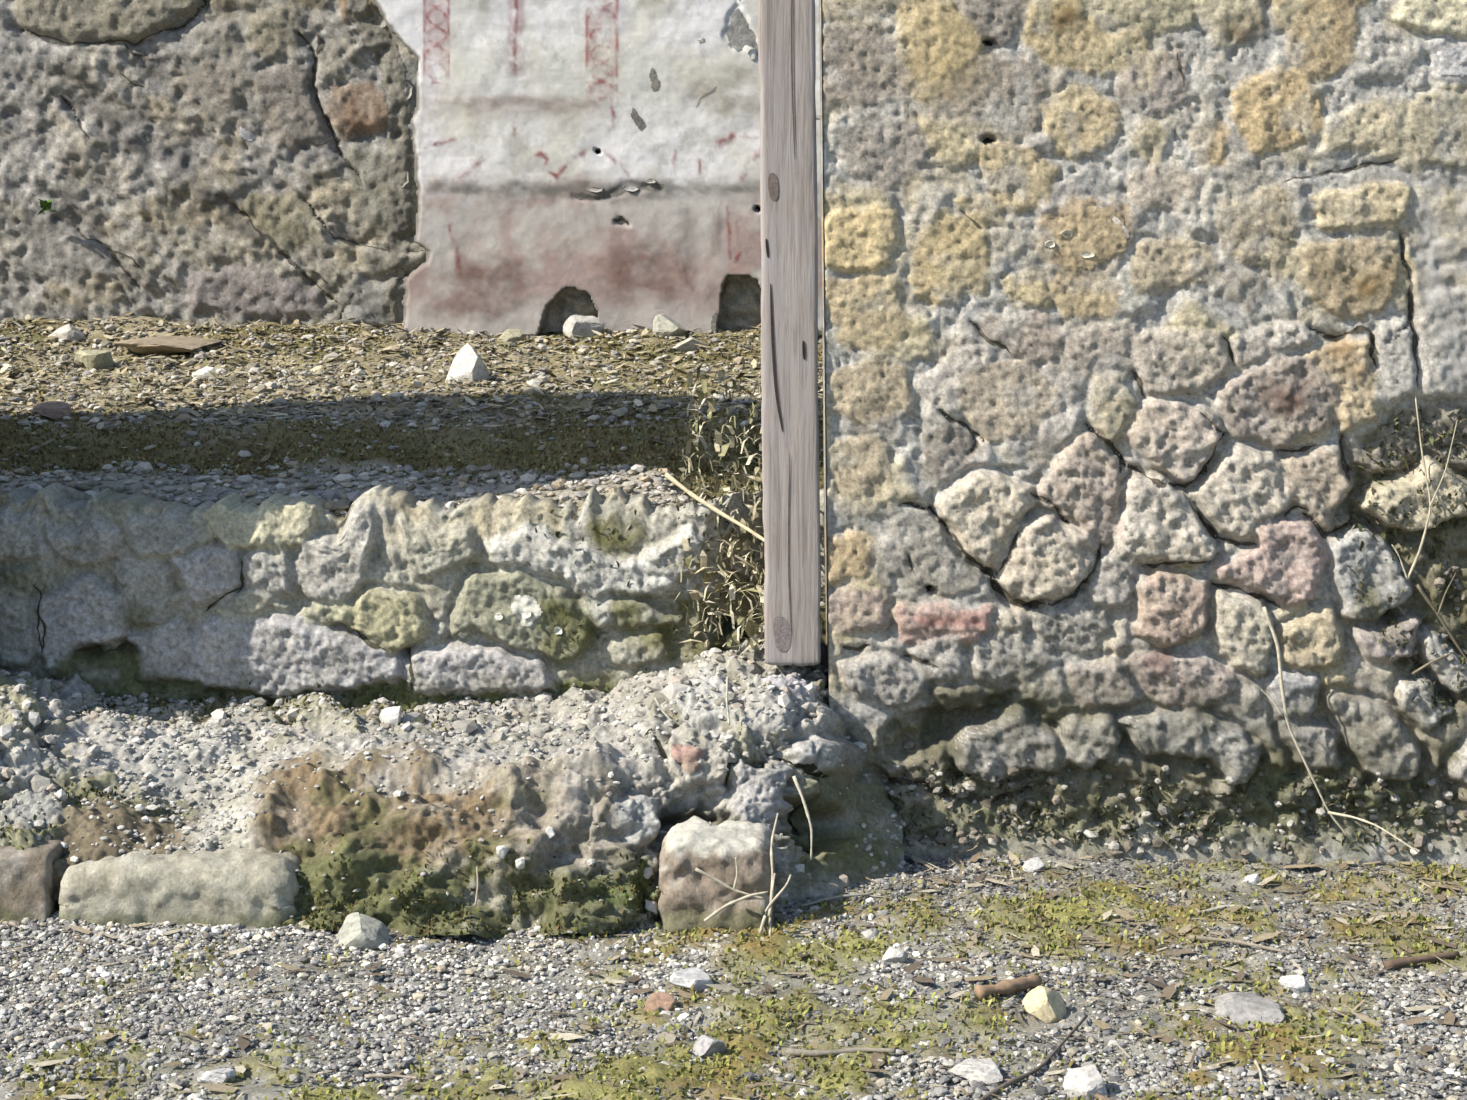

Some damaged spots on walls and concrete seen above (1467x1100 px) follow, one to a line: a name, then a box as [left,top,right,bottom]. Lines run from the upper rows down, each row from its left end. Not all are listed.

spalling [345,0,413,321]
crack [1309,235,1419,386]